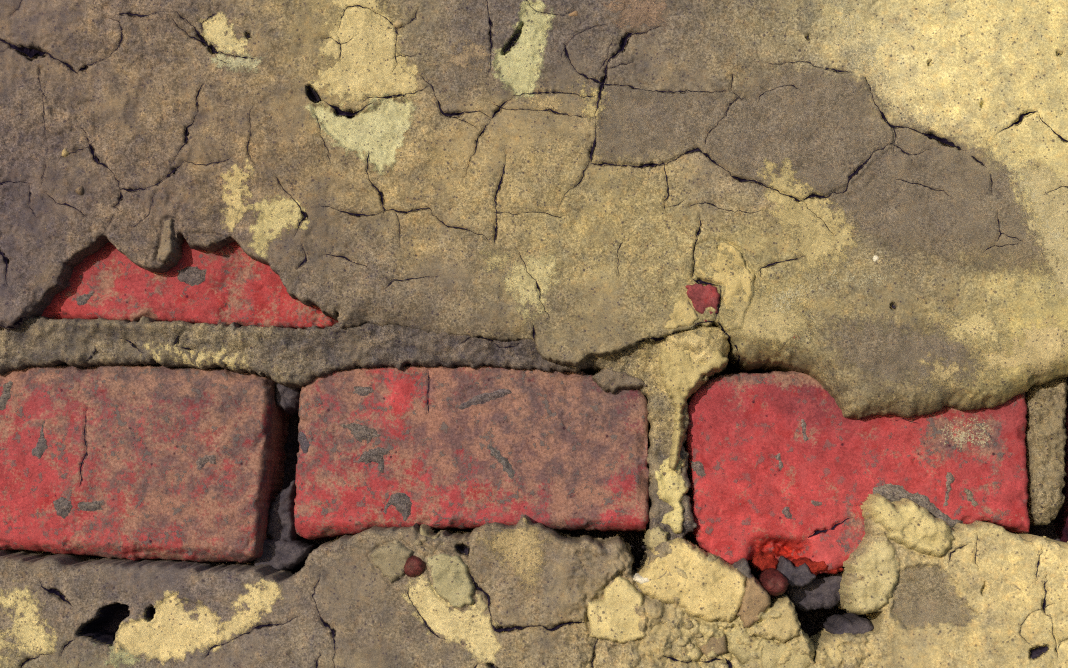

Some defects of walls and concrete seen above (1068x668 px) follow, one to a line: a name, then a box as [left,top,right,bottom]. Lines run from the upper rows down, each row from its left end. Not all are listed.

crack [0,11,253,233]
crack [998,110,1068,142]
crack [276,0,1022,368]
spalling [747,551,844,576]
crack [948,532,978,566]
crack [39,581,71,605]
crack [205,574,335,668]
crack [407,588,444,639]
crack [468,568,598,668]
crack [1019,544,1068,657]
crack [20,639,81,668]
crack [665,656,732,668]